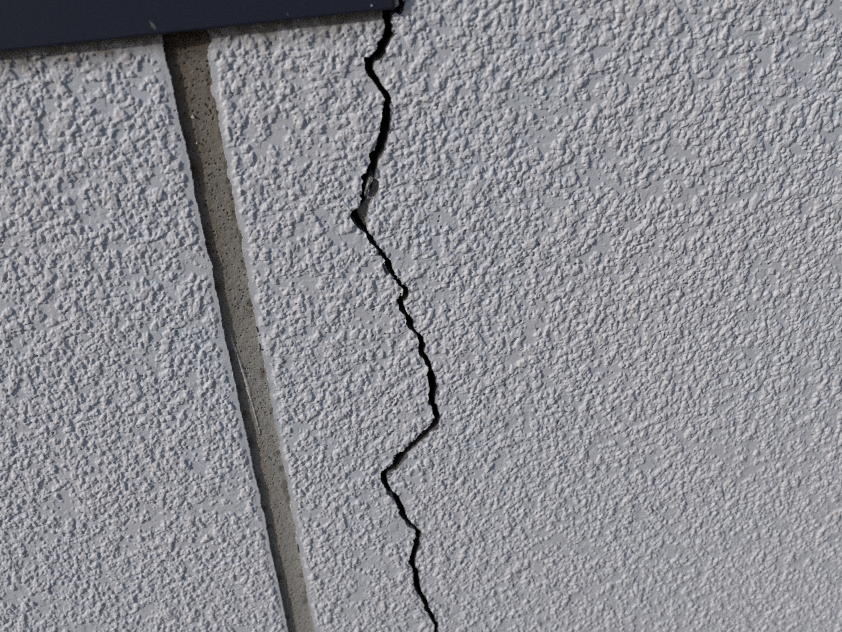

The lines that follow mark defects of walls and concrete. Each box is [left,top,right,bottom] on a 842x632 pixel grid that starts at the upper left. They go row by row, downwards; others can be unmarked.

crack [307,0,440,632]